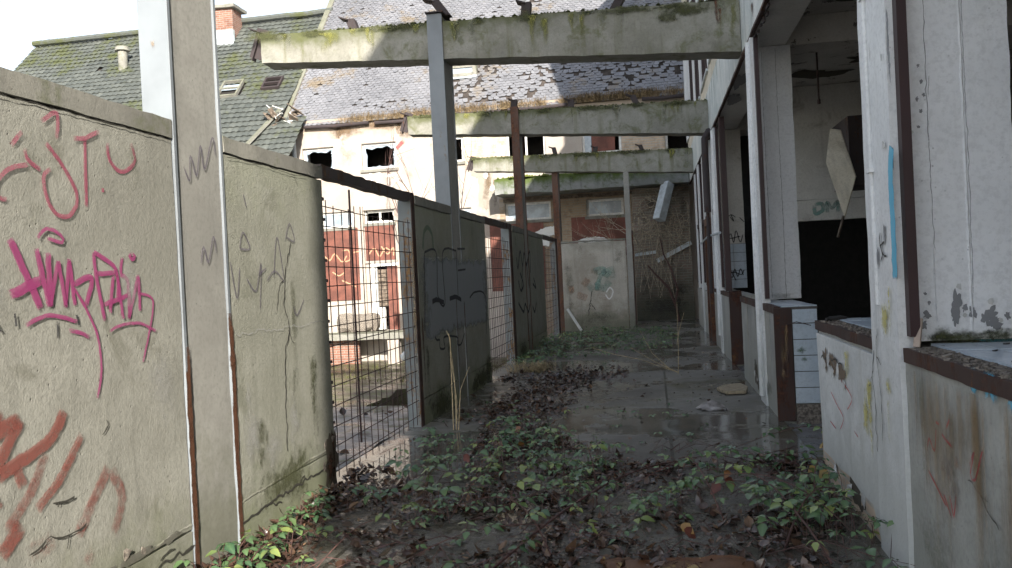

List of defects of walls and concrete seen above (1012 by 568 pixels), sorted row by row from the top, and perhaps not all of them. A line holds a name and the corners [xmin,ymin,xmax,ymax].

peeling [951,284,1011,330]
corrosion [186,348,200,568]